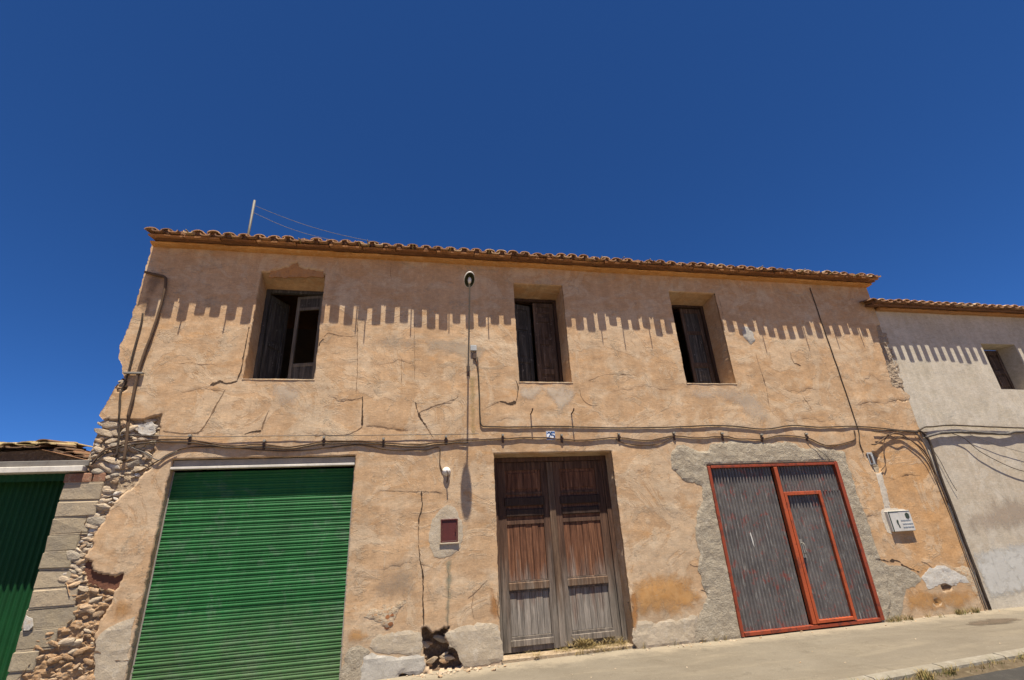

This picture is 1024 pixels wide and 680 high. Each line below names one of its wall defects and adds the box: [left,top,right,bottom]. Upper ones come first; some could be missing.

crack [164,327,250,434]
crack [319,320,454,437]
crack [481,381,519,411]
spalling [57,416,162,590]
crack [386,490,500,627]
peeling [921,565,982,596]
spalling [422,627,462,671]